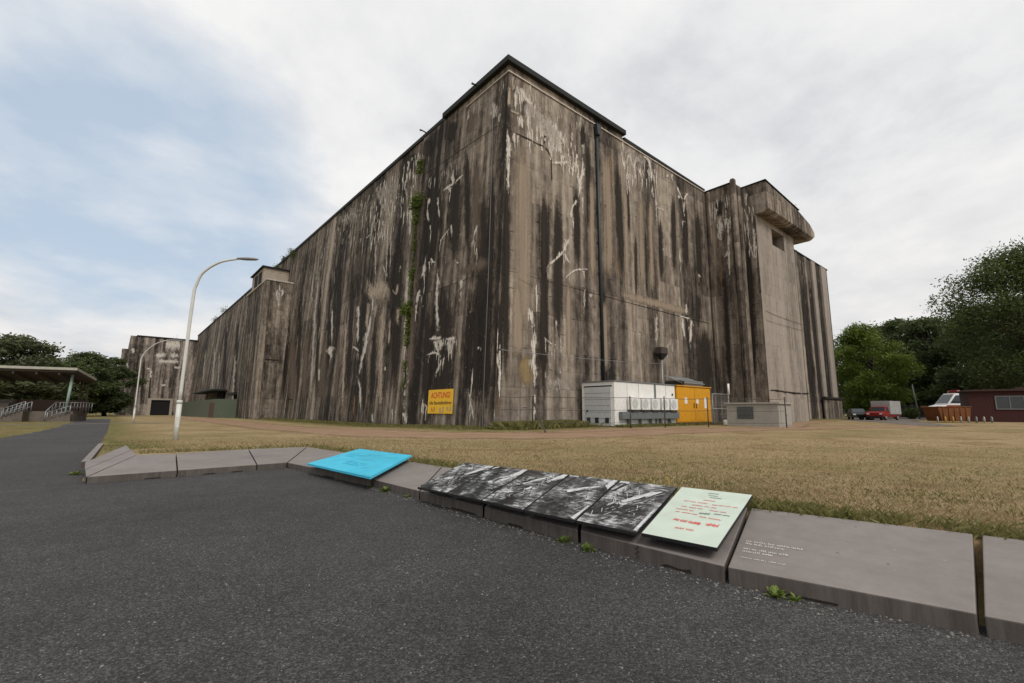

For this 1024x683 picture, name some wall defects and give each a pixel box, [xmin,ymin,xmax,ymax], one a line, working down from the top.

crack [514,132,552,178]
damp [283,77,757,426]
damp [133,358,151,405]
damp [203,303,246,399]
damp [802,272,837,395]